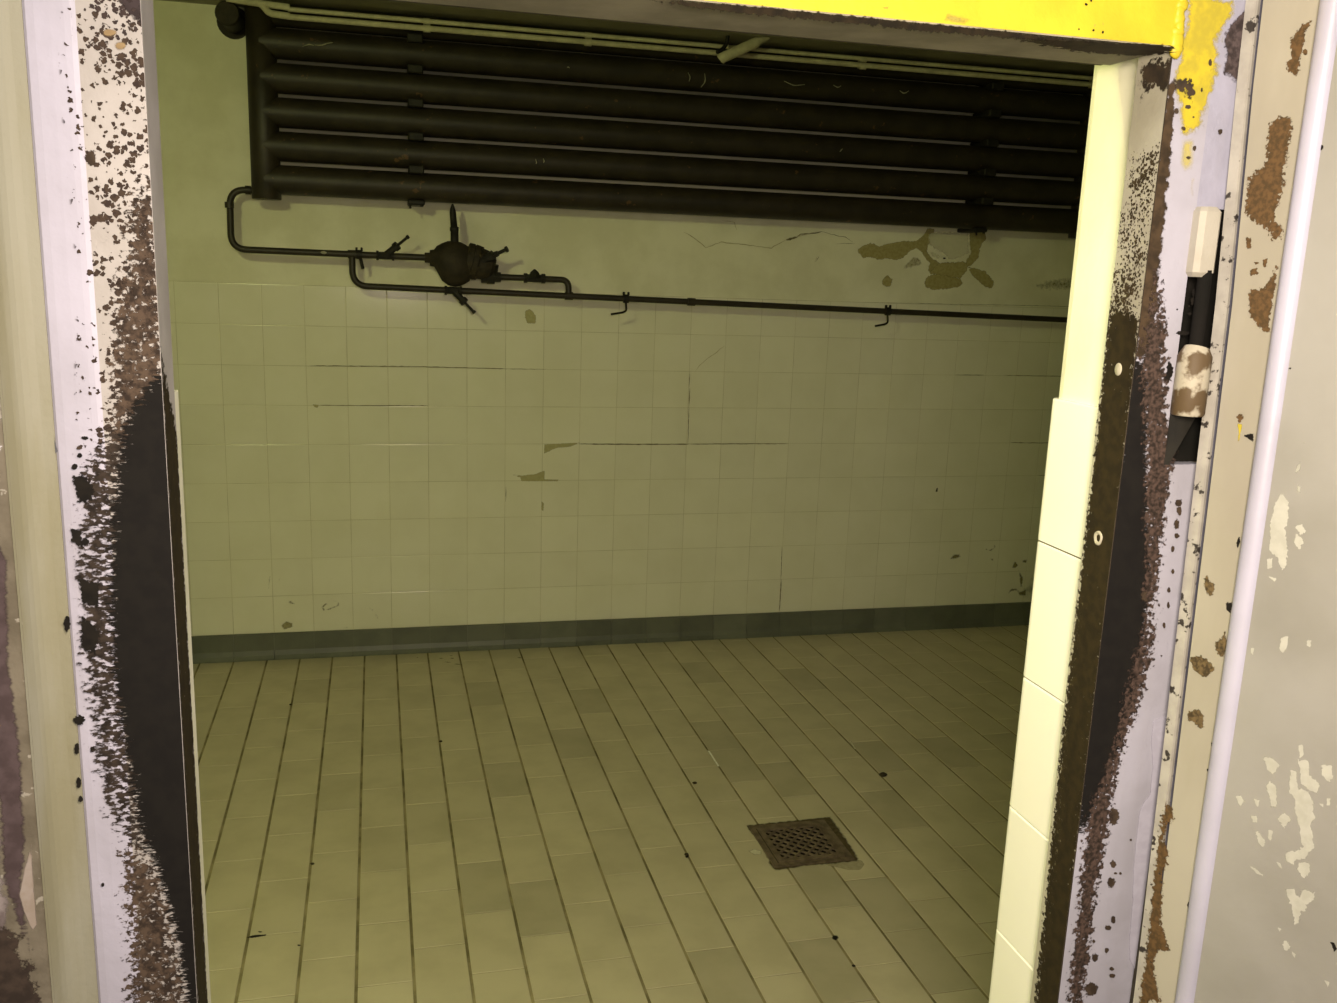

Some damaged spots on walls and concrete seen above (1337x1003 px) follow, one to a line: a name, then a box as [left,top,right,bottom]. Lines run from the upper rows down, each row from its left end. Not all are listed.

crack [684,220,853,261]
flaking render [858,228,994,290]
corrosion [1244,115,1293,332]
crack [583,347,784,445]
corrosion [61,0,190,1003]
peeling [517,471,557,481]
corrosion [656,0,1204,1003]
peeling [1267,464,1306,582]
peeling [1236,744,1333,958]